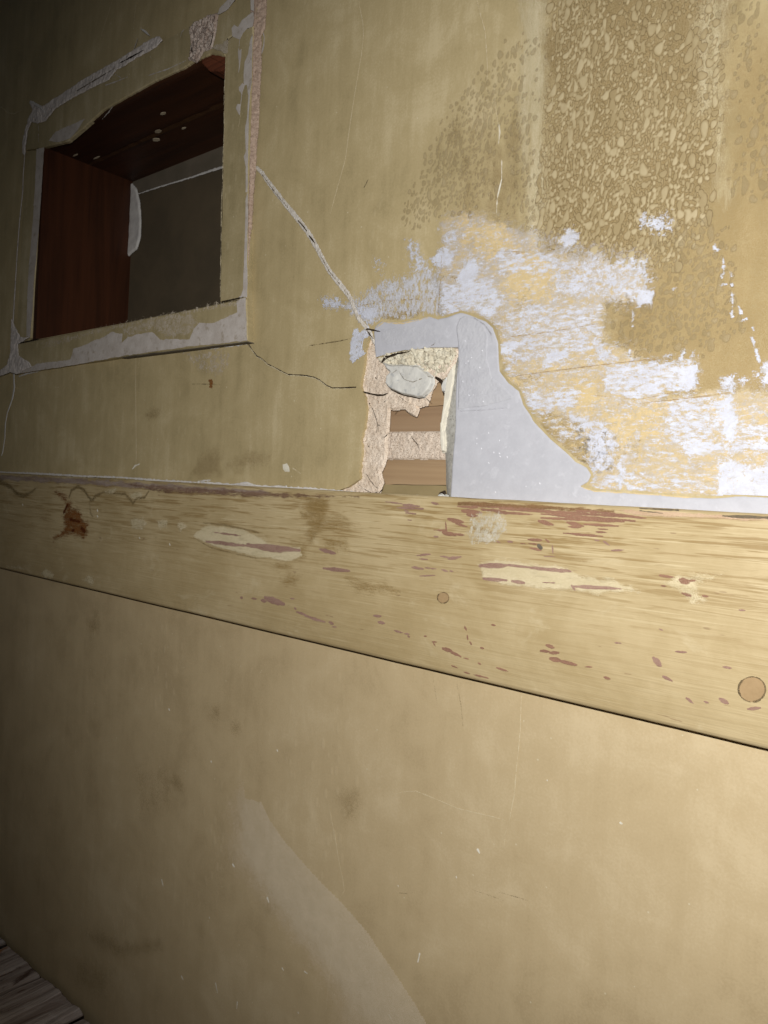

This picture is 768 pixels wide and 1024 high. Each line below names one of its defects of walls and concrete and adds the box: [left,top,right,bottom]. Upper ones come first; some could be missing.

corrosion [52,490,89,542]
peeling [18,0,267,377]
crack [248,344,387,396]
crack [256,166,380,345]
peeling [0,204,768,596]
leakage [436,0,768,418]